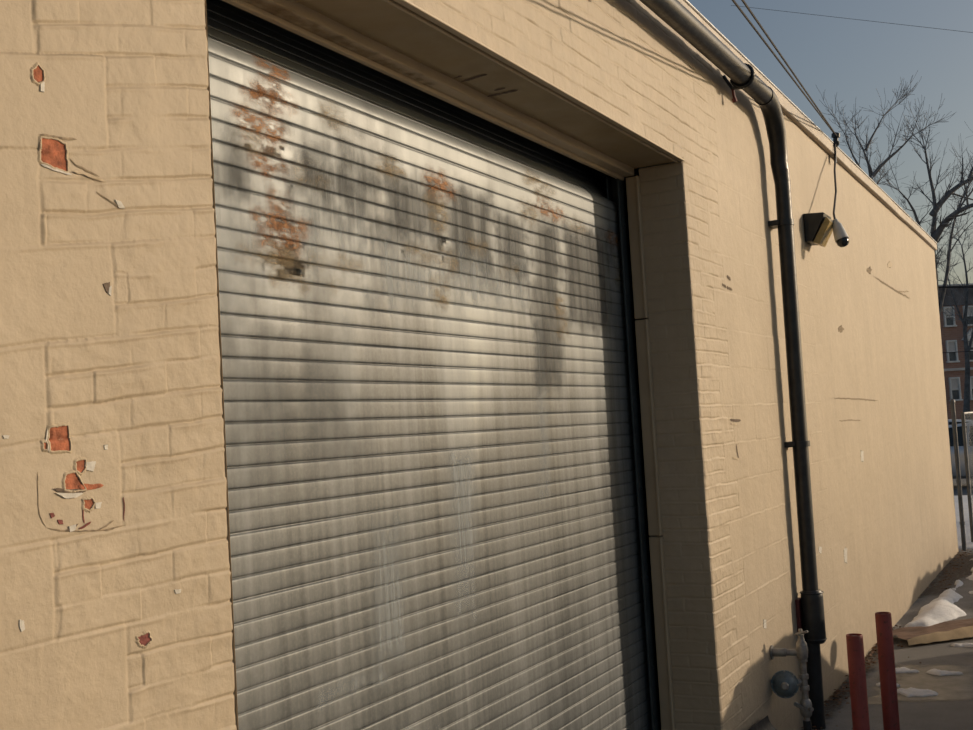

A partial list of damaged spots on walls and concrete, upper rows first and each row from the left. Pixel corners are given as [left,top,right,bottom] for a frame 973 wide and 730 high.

peeling [30,62,45,92]
corrosion [235,57,288,143]
spalling [37,134,125,209]
corrosion [248,145,286,175]
corrosion [253,197,307,264]
damp [303,150,375,218]
damp [390,179,440,245]
damp [449,187,526,302]
damp [535,224,609,387]
peeling [37,422,125,532]
peeling [135,630,153,649]